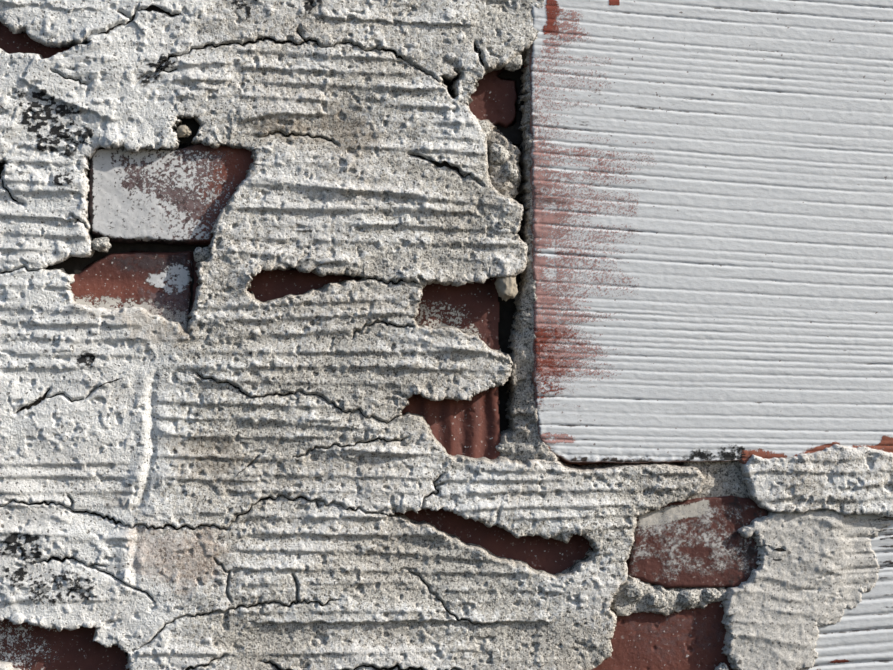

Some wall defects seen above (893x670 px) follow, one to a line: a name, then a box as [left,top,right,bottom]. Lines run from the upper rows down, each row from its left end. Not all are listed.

crack [90,5,179,35]
crack [157,30,445,87]
spalling [70,143,254,330]
spalling [248,269,363,302]
crack [195,372,403,457]
spalling [402,387,501,460]
crack [0,496,384,530]
spalling [390,509,593,574]
spalling [626,495,768,588]
crack [40,556,156,603]
spalling [0,619,129,670]
crack [342,662,423,670]